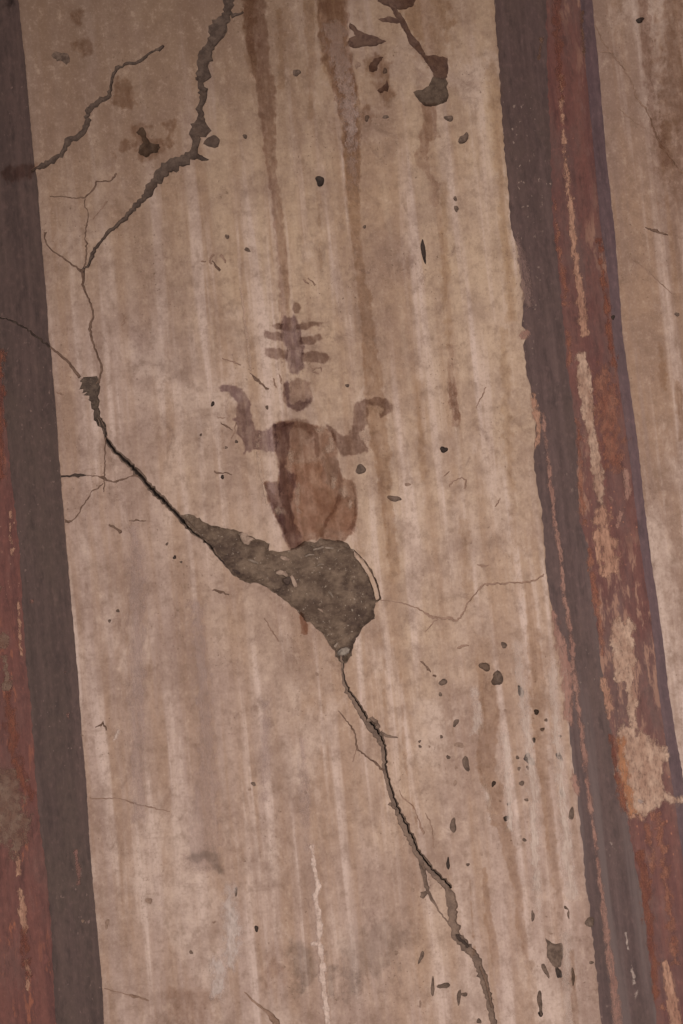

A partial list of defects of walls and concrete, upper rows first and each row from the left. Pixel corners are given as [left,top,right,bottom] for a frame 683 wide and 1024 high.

flaking render [347,23,389,93]
flaking render [378,0,453,122]
crack [0,0,244,595]
crack [222,358,282,390]
flaking render [181,514,381,664]
crack [339,655,497,1024]